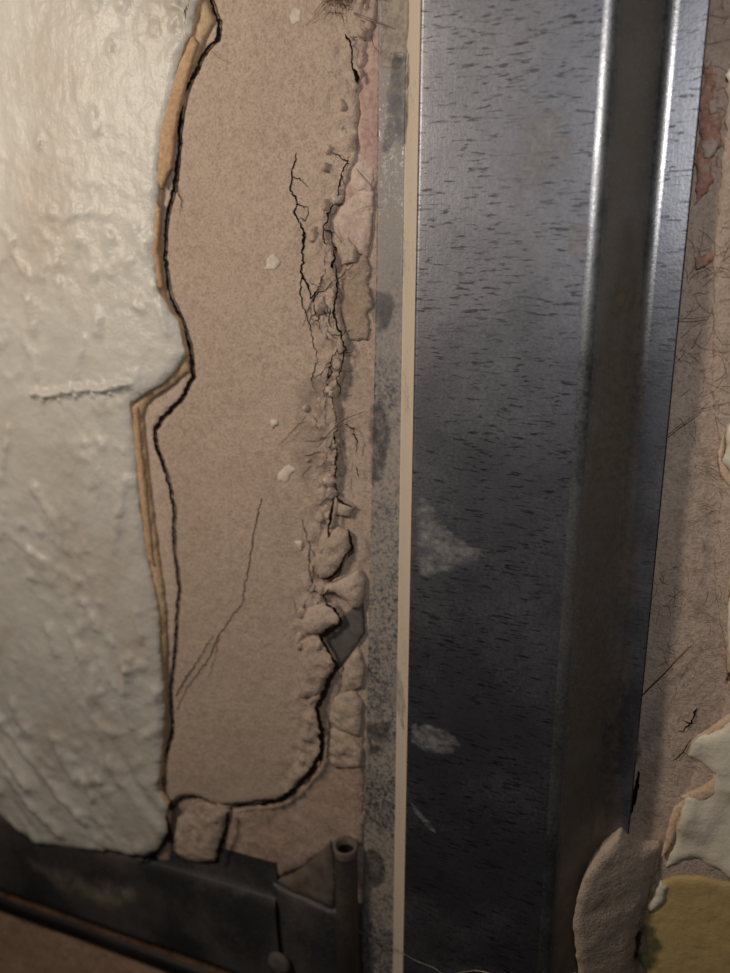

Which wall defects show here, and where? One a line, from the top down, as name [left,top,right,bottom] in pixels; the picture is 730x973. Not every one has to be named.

peeling [152,0,216,298]
flaking render [332,6,378,341]
peeling [132,351,193,703]
crack [140,0,360,864]
peeling [718,423,730,486]
flaking render [225,646,366,877]
peeling [647,880,667,913]
crack [673,707,698,761]
peeling [661,713,730,878]